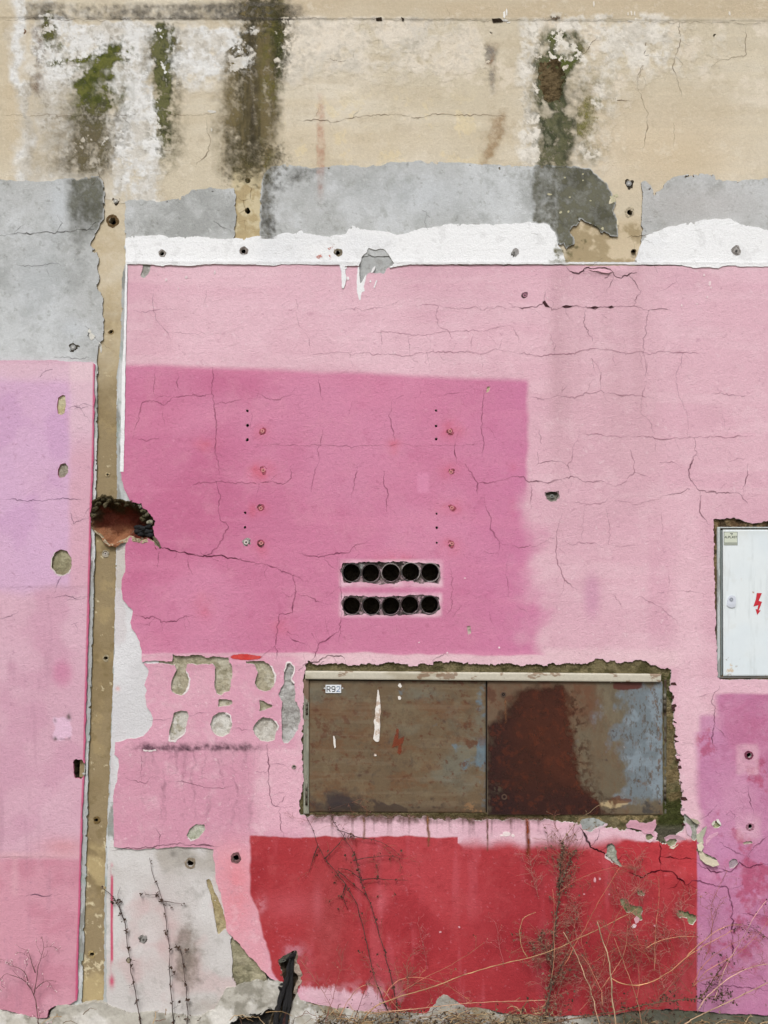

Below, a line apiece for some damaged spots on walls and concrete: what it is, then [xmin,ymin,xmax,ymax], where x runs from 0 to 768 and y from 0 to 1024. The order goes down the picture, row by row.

flaking render [0,0,19,180]
leakage [2,0,501,239]
flaking render [24,0,768,266]
leakage [511,11,750,262]
flaking render [91,190,126,282]
spalling [141,249,166,278]
peeling [333,249,394,300]
peeling [90,494,233,802]
rust [487,685,605,854]
spalling [608,890,645,928]
crack [580,828,762,959]
spalling [677,910,696,924]